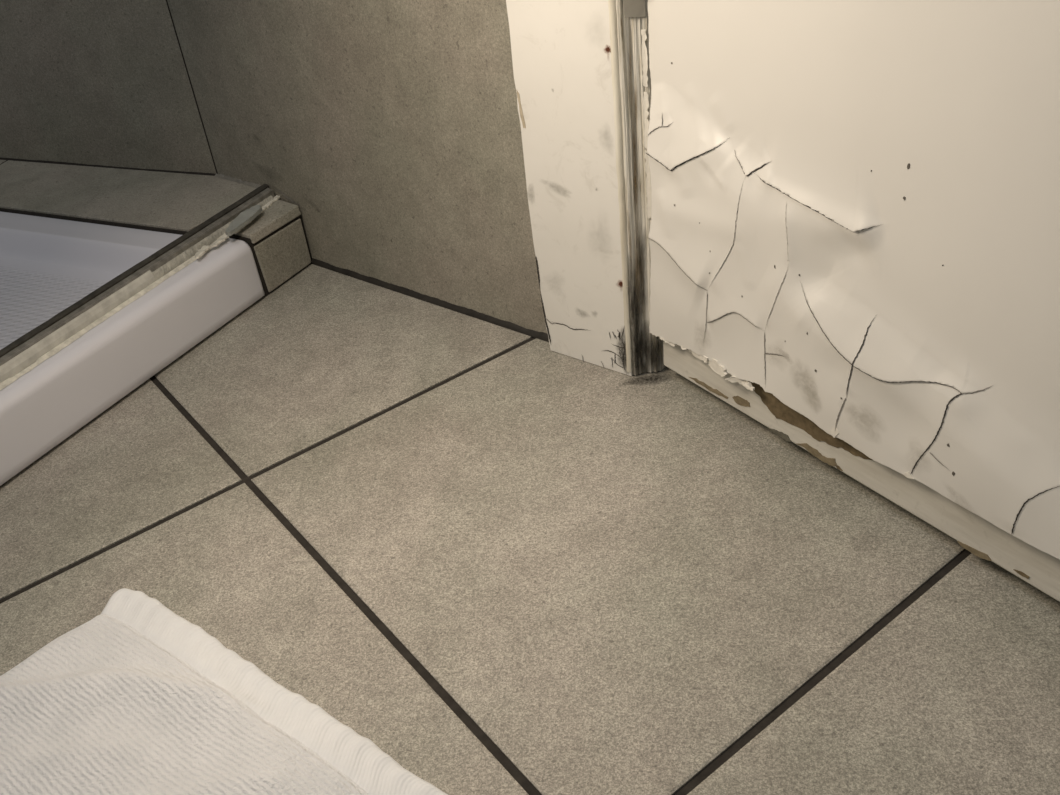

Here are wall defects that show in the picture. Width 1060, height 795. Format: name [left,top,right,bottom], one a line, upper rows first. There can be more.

damp [629,237,662,383]
crack [646,119,991,474]
peeling [641,29,1060,535]
crack [1011,486,1059,534]